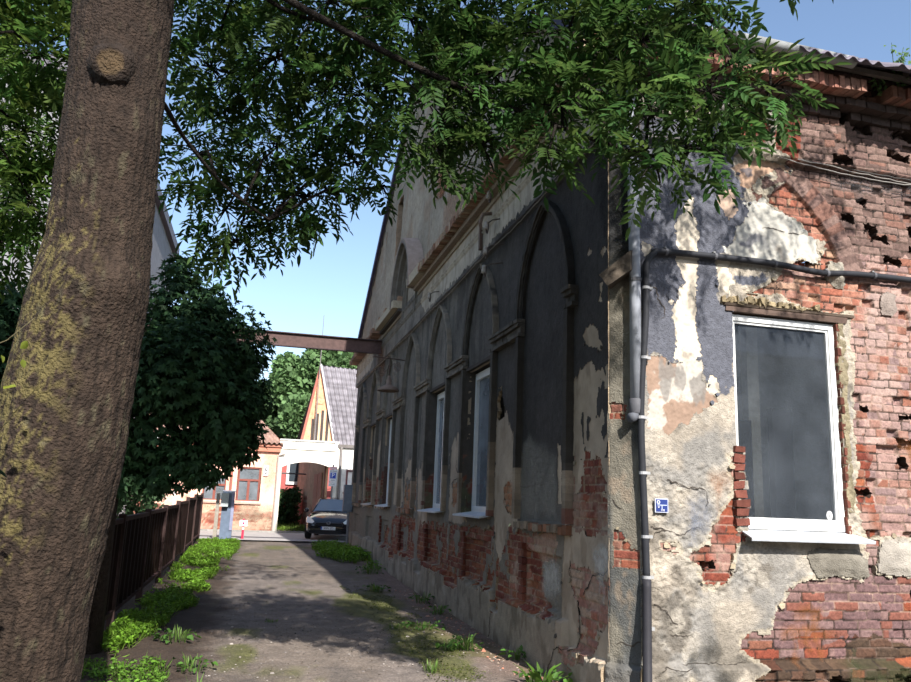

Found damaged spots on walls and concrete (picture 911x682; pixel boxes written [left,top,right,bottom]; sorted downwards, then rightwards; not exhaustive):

spalling [812,67,911,98]
peeling [641,241,653,256]
peeling [646,197,720,436]
spalling [715,112,911,682]
peeling [363,324,640,671]
spalling [660,542,679,554]
spalling [689,498,746,585]